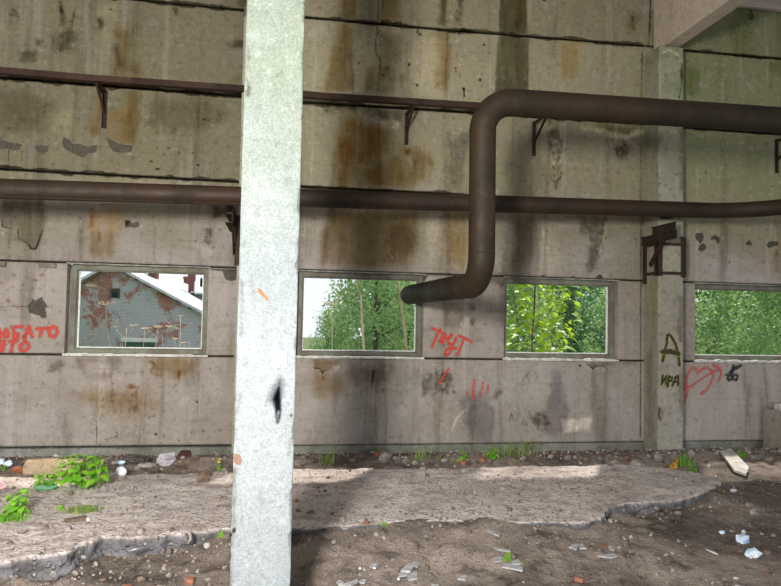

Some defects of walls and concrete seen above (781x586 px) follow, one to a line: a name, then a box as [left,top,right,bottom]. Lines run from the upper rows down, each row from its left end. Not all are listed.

peeling [695,233,720,252]